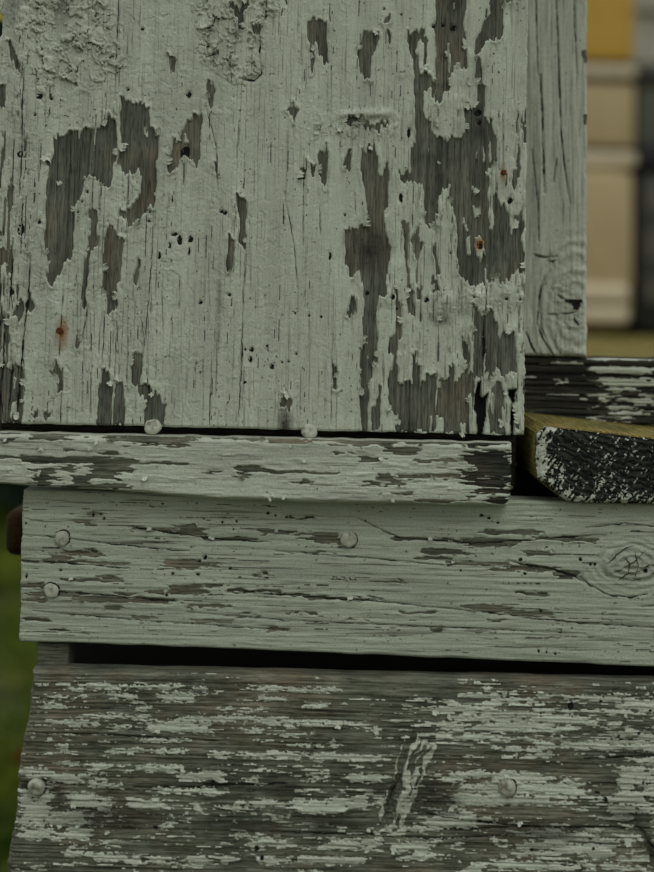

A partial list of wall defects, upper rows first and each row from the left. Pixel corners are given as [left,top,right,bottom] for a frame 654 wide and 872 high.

peeling [0,0,536,504]
peeling [540,358,654,423]
peeling [535,426,654,504]
peeling [21,550,129,566]
peeling [20,578,233,610]
peeling [163,559,218,570]
crack [23,492,654,683]
peeling [391,529,599,579]
peeling [460,604,557,618]
peeling [10,673,654,872]
crack [21,677,654,871]